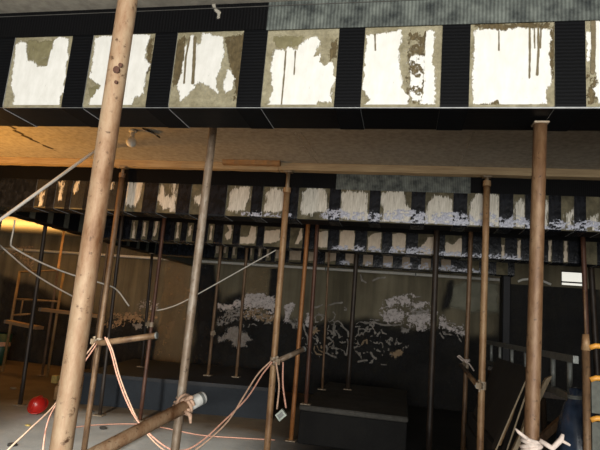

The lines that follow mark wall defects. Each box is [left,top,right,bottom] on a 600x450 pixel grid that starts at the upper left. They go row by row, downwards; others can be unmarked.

peeling [11,37,70,105]
peeling [172,32,244,101]
peeling [362,30,437,105]
crack [9,126,55,151]
water stain [191,264,499,413]
peeling [283,293,465,365]
water stain [510,284,528,366]
water stain [541,286,600,422]